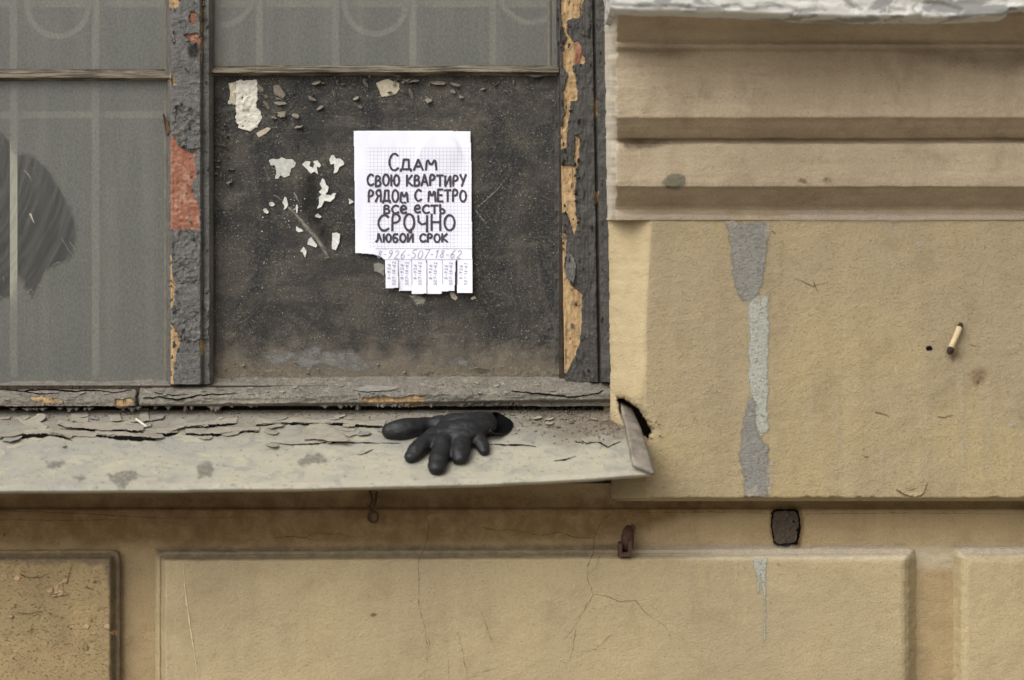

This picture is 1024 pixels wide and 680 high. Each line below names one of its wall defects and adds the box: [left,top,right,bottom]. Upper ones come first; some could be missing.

peeling [169,0,212,84]
peeling [256,78,303,137]
peeling [304,75,470,111]
peeling [163,82,236,252]
peeling [480,0,603,384]
peeling [0,391,187,447]
peeling [302,413,382,443]
spalling [618,399,661,439]